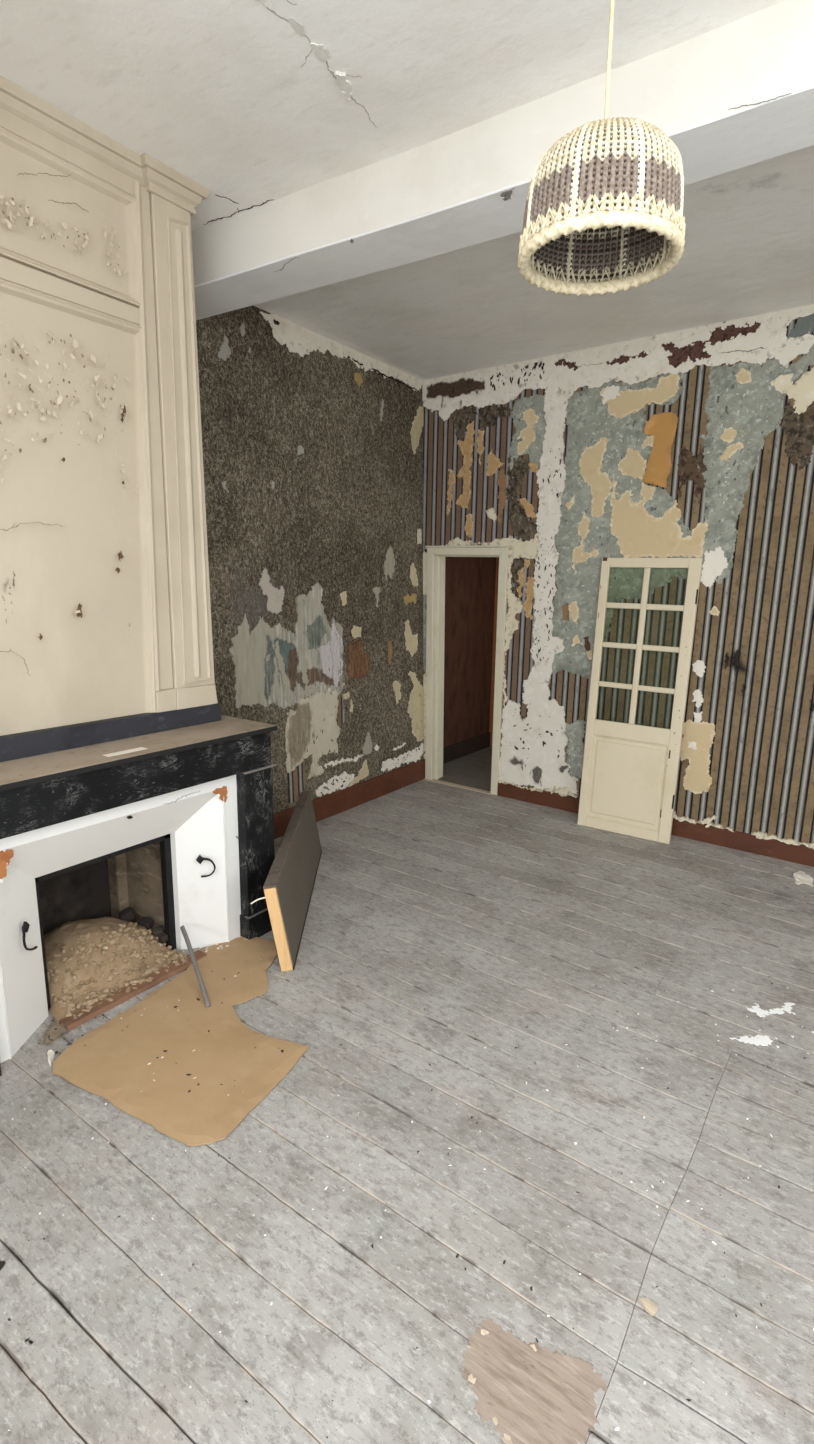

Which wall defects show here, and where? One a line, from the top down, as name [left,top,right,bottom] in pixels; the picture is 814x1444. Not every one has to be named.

crack [262,0,377,128]
flaking render [259,304,814,798]
spalling [213,786,229,802]
flaking render [229,582,424,797]